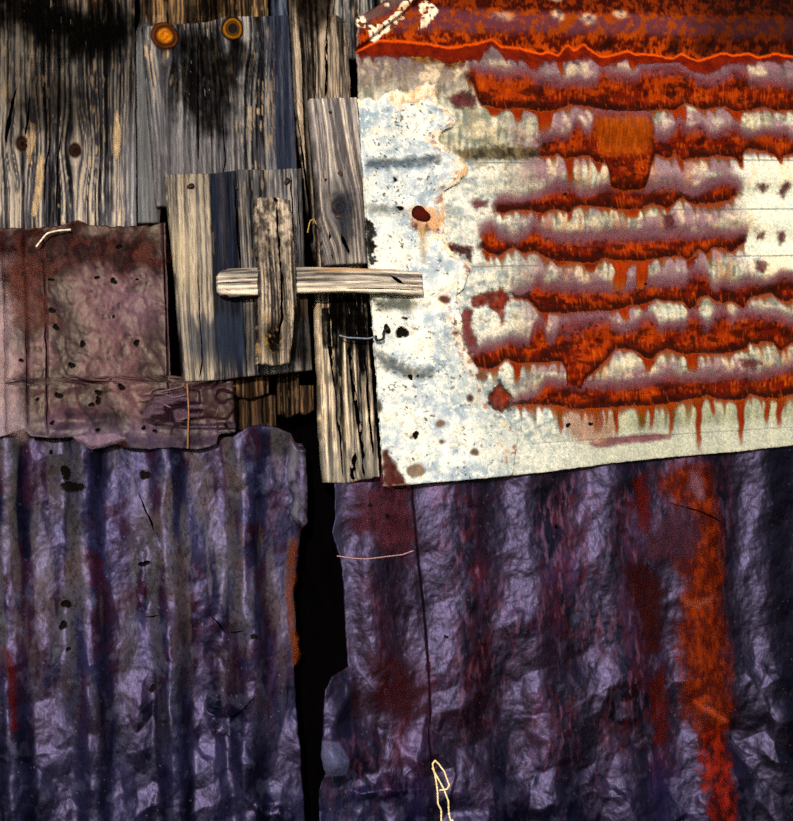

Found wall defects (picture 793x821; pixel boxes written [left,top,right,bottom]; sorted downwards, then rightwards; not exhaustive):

peeling [356,0,438,43]
rust [356,0,793,447]
rust [636,477,652,534]
rust [621,564,663,654]
rust [661,461,736,821]
rust [6,650,16,732]
rust [651,668,666,743]